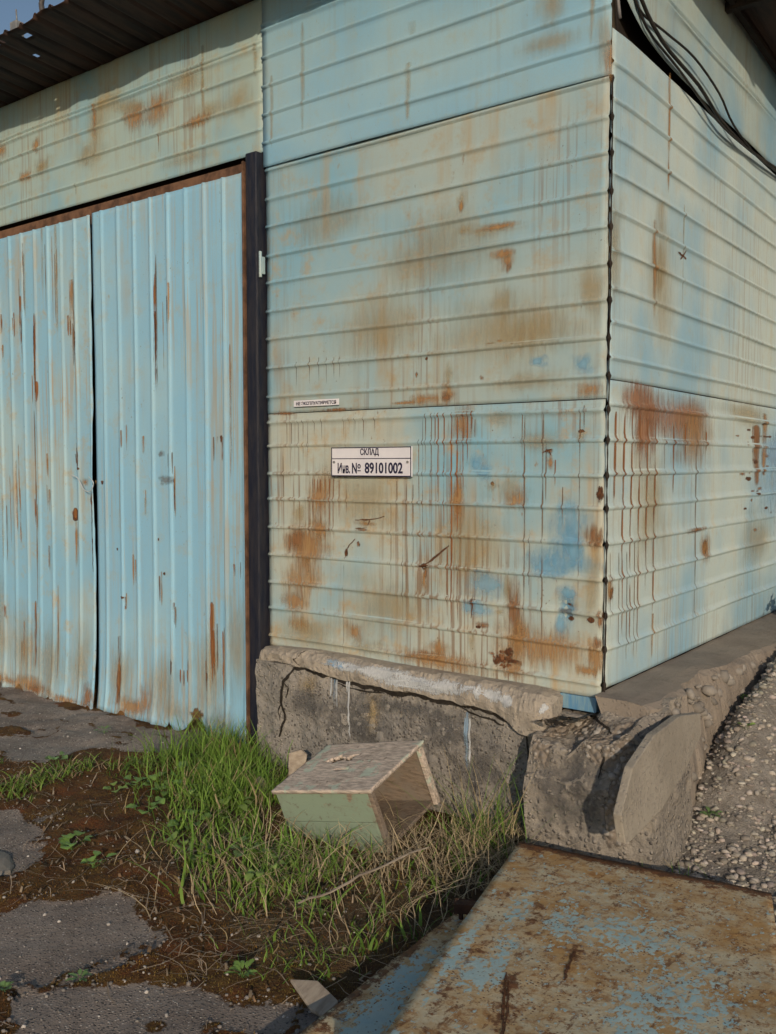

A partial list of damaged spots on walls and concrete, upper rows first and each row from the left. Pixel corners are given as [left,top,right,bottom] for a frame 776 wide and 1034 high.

corrosion [1,253,38,401]
corrosion [45,255,75,363]
corrosion [153,258,169,377]
corrosion [389,385,488,628]
corrosion [578,387,709,674]
corrosion [736,415,771,510]
corrosion [205,602,225,692]
leakage [405,652,467,670]
crack [278,651,612,778]
corrosion [491,588,523,675]
leakage [519,628,572,662]
spalling [533,710,637,848]